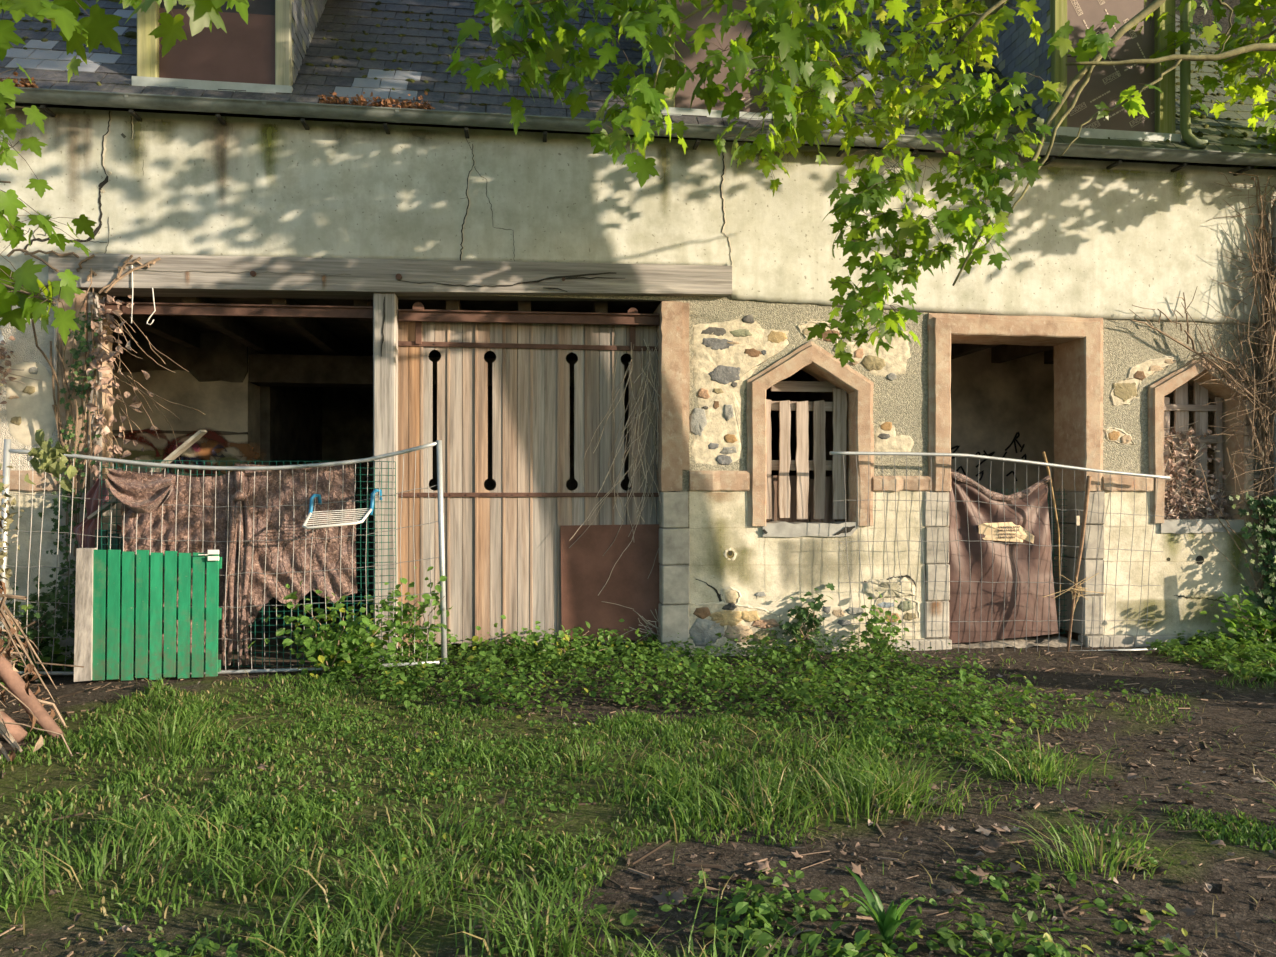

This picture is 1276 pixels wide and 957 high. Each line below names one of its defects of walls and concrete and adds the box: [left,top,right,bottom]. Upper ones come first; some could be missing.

water stain [131,121,172,161]
water stain [260,125,279,158]
crack [23,111,350,276]
crack [720,145,733,266]
crack [381,139,616,357]
flaking render [689,315,914,466]
spalling [1109,355,1179,406]
spalling [1104,427,1135,445]
spalling [687,586,920,652]